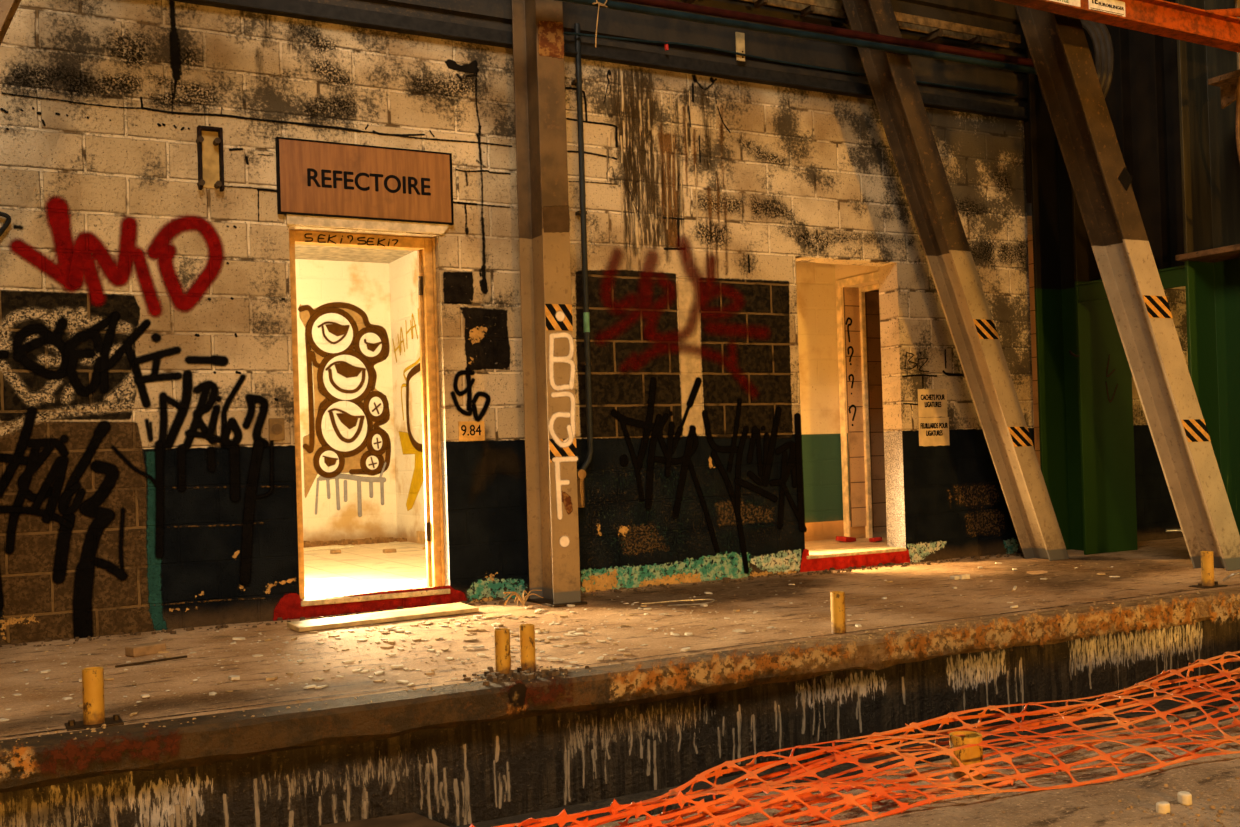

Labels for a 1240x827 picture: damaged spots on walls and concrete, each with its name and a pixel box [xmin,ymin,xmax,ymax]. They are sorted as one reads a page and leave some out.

leakage [169,0,182,111]
leakage [464,74,488,294]
leakage [607,68,711,261]
corrosion [884,593,1240,659]
corrosion [0,747,40,778]
leakage [0,771,229,827]
leakage [253,744,472,827]
leakage [493,736,510,809]
leakage [558,700,756,805]
leakage [774,700,782,759]
leakage [796,670,886,740]